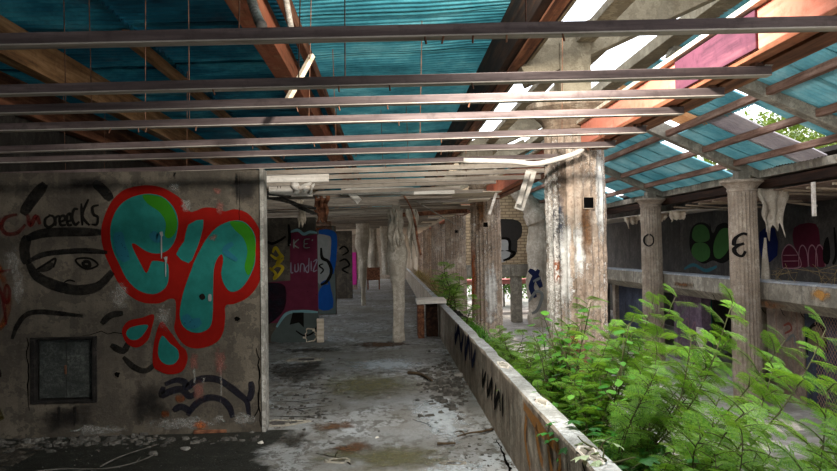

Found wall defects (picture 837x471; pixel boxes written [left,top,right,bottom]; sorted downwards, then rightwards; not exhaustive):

leakage [269,348,339,383]
leakage [337,448,442,468]
crack [496,440,512,471]